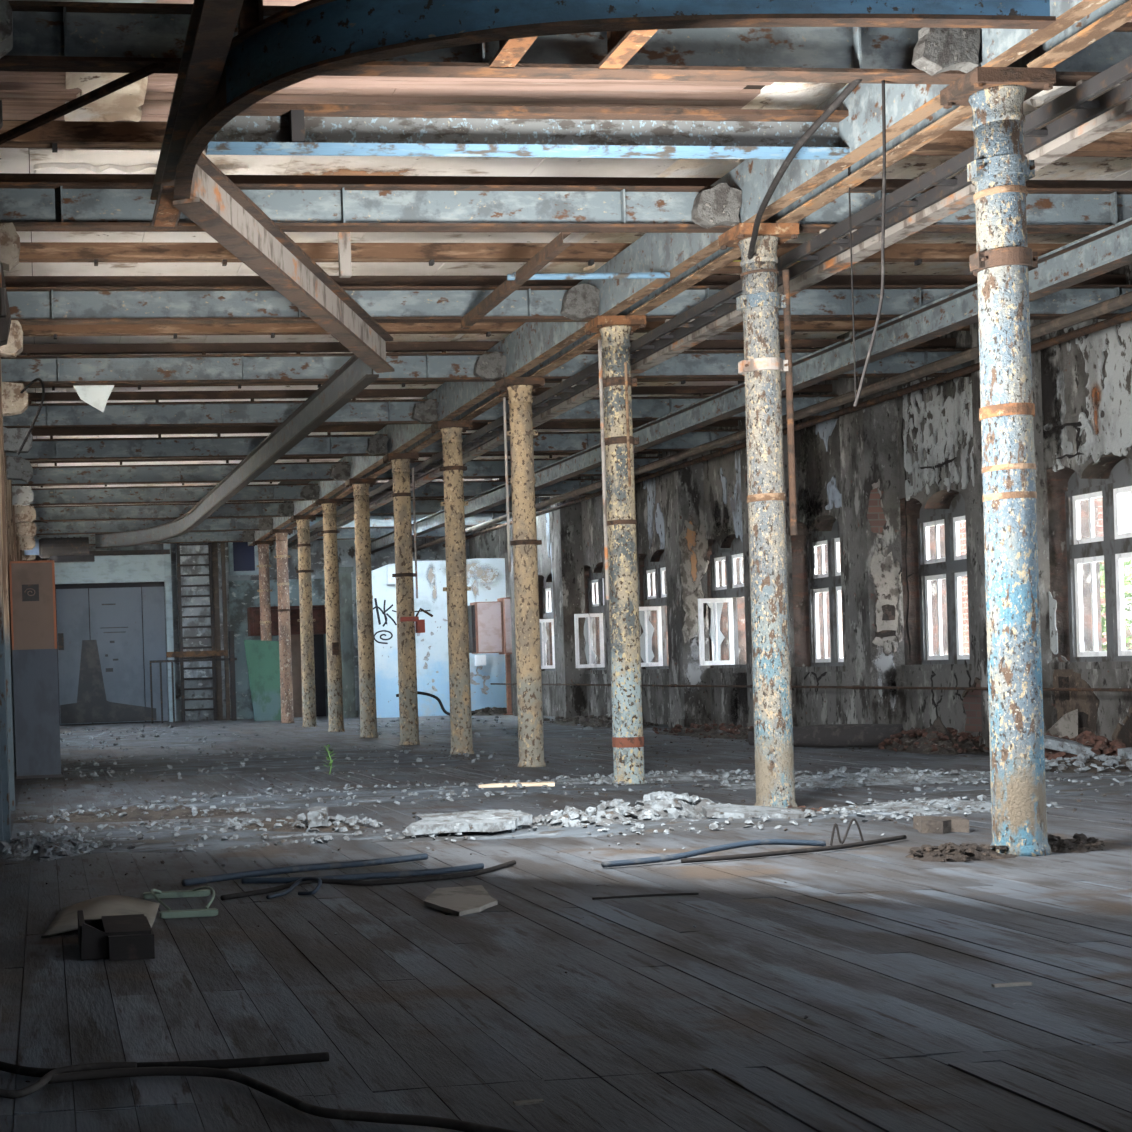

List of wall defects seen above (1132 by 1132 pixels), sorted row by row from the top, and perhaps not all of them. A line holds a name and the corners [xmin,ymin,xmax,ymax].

peeling [902,377,975,501]
peeling [1044,319,1132,472]
spalling [867,479,903,655]